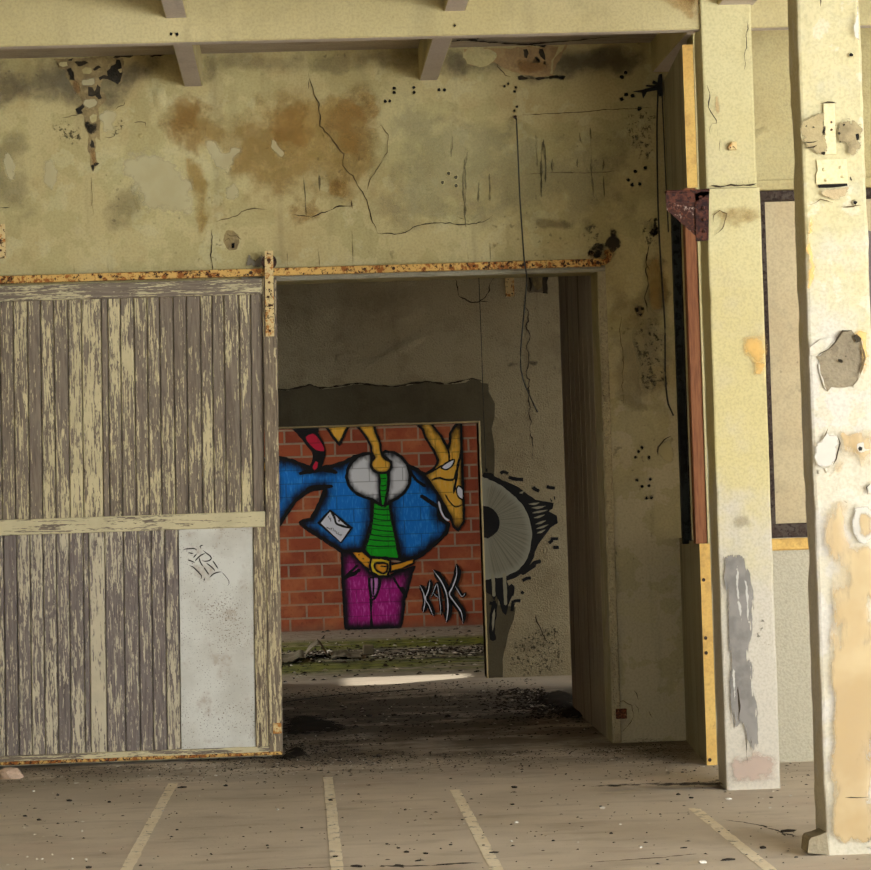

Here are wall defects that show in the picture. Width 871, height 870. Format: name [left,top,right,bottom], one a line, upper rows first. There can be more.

flaking render [464,44,567,77]
flaking render [54,56,124,171]
crack [294,69,488,235]
flaking render [800,101,835,155]
flaking render [838,121,863,155]
crack [523,296,535,456]
flaking render [810,330,866,392]
peeling [278,379,495,475]
peeling [486,592,516,678]